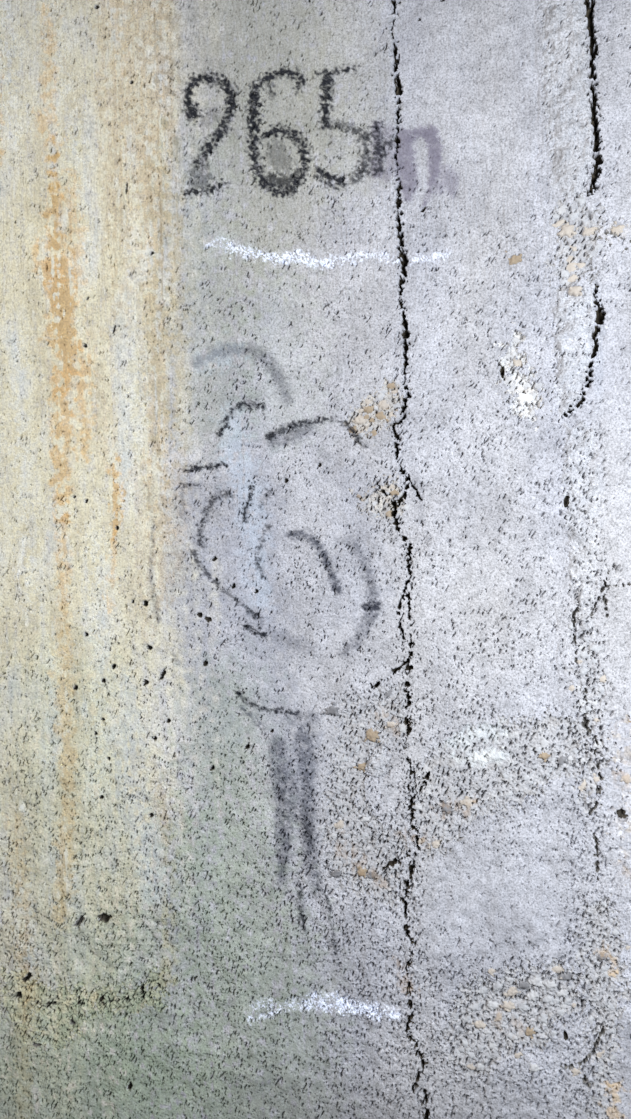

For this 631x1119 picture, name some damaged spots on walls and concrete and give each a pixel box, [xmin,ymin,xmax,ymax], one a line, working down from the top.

crack [582,0,603,197]
rust [43,153,80,396]
crack [563,284,606,417]
crack [370,0,431,1119]
crack [560,1025,608,1087]